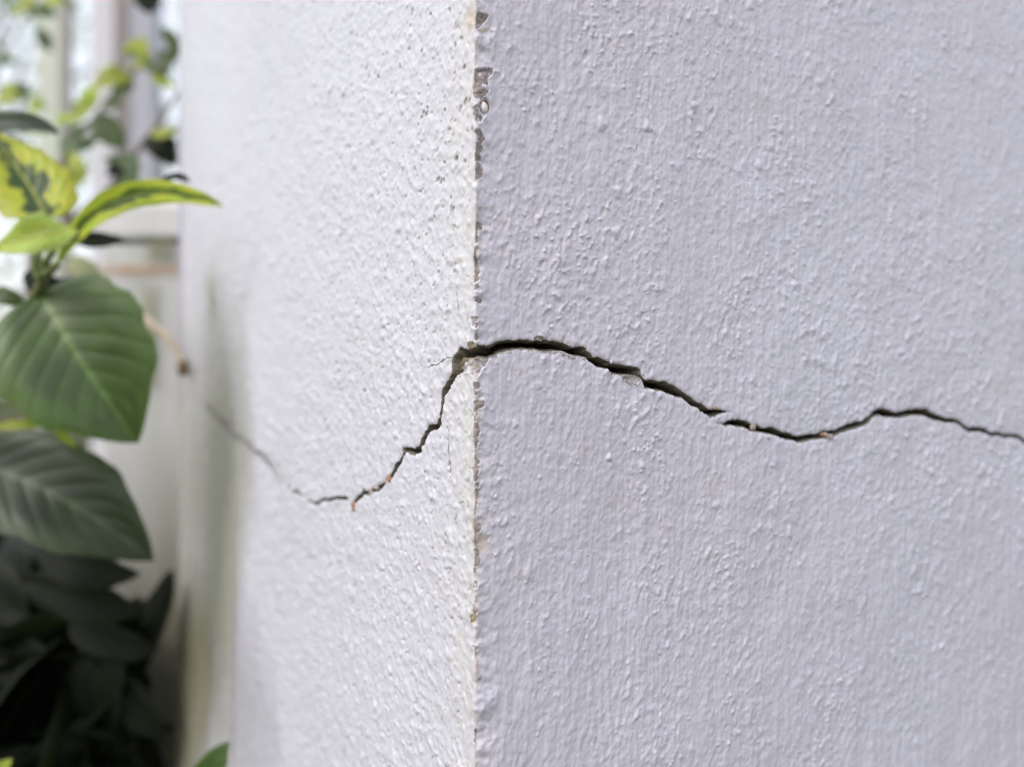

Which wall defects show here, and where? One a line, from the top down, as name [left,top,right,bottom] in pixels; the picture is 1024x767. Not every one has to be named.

crack [198,336,1024,512]